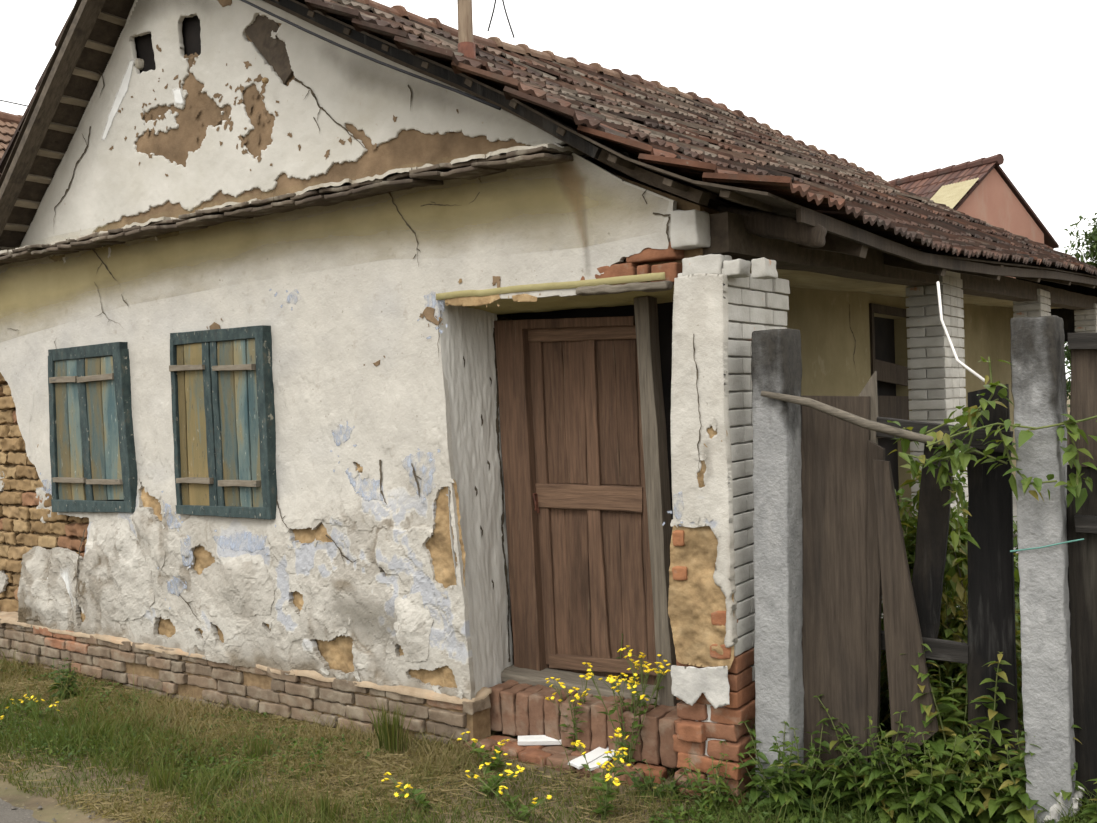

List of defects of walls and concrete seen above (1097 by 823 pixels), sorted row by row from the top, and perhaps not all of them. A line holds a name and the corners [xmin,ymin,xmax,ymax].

peeling [95,14,531,232]
crack [294,78,365,148]
crack [388,178,482,267]
crack [92,248,128,323]
flaking render [137,478,268,645]
flaking render [275,516,333,548]
flaking render [405,449,466,599]
flaking render [315,627,360,682]
flaking render [408,665,463,699]
flaking render [663,507,756,807]